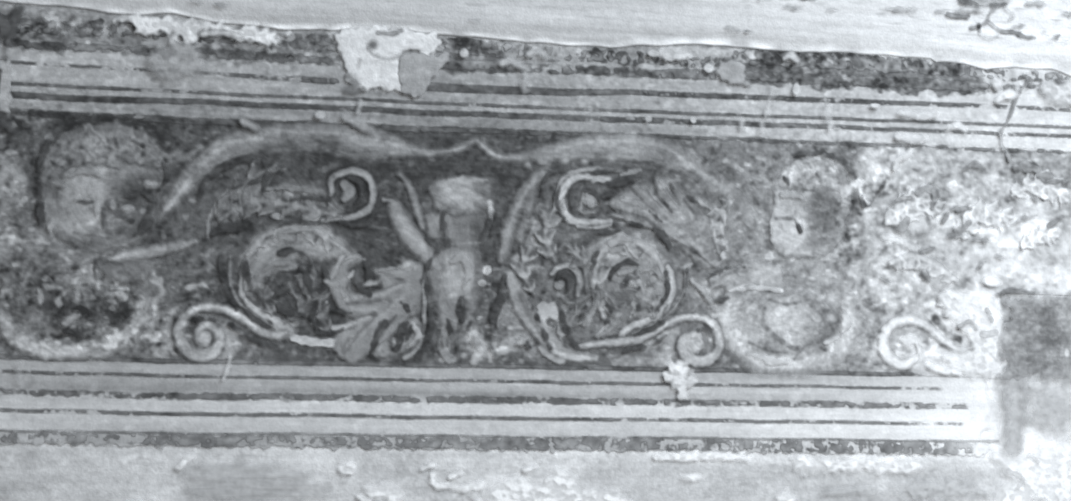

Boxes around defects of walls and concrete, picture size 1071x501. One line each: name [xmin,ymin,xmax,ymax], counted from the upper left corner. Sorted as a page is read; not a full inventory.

crack [0,5,24,78]
peeling [360,30,403,61]
crack [999,74,1033,161]